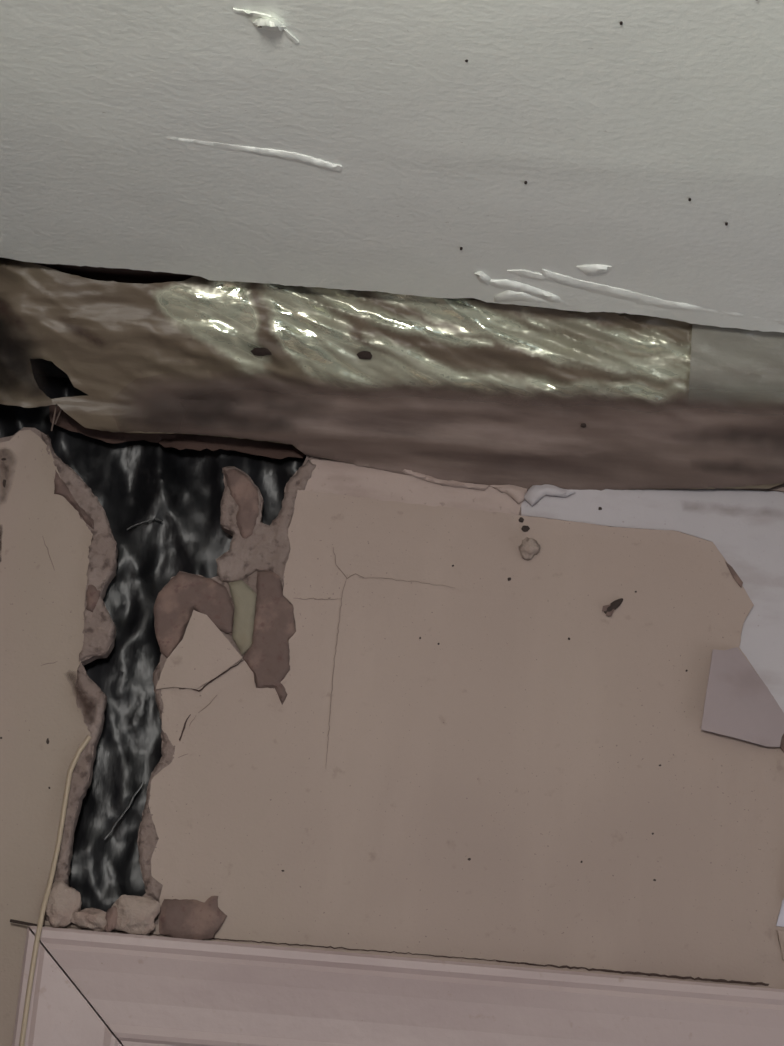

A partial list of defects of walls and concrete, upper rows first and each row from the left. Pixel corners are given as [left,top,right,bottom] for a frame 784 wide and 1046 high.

spalling [41,433,117,884]
spalling [138,459,316,901]
crack [297,549,452,762]
peeling [402,469,784,753]
peeling [776,898,784,927]